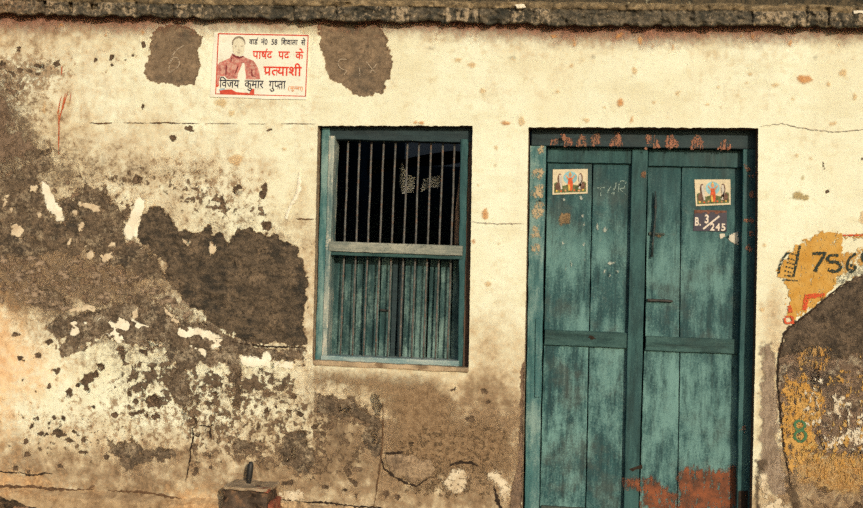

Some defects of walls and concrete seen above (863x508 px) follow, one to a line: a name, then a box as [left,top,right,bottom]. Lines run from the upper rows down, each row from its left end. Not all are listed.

crack [768,123,863,132]
flaking render [0,60,382,498]
flaking render [776,233,863,459]
water stain [314,373,509,480]
flaking render [804,474,863,508]